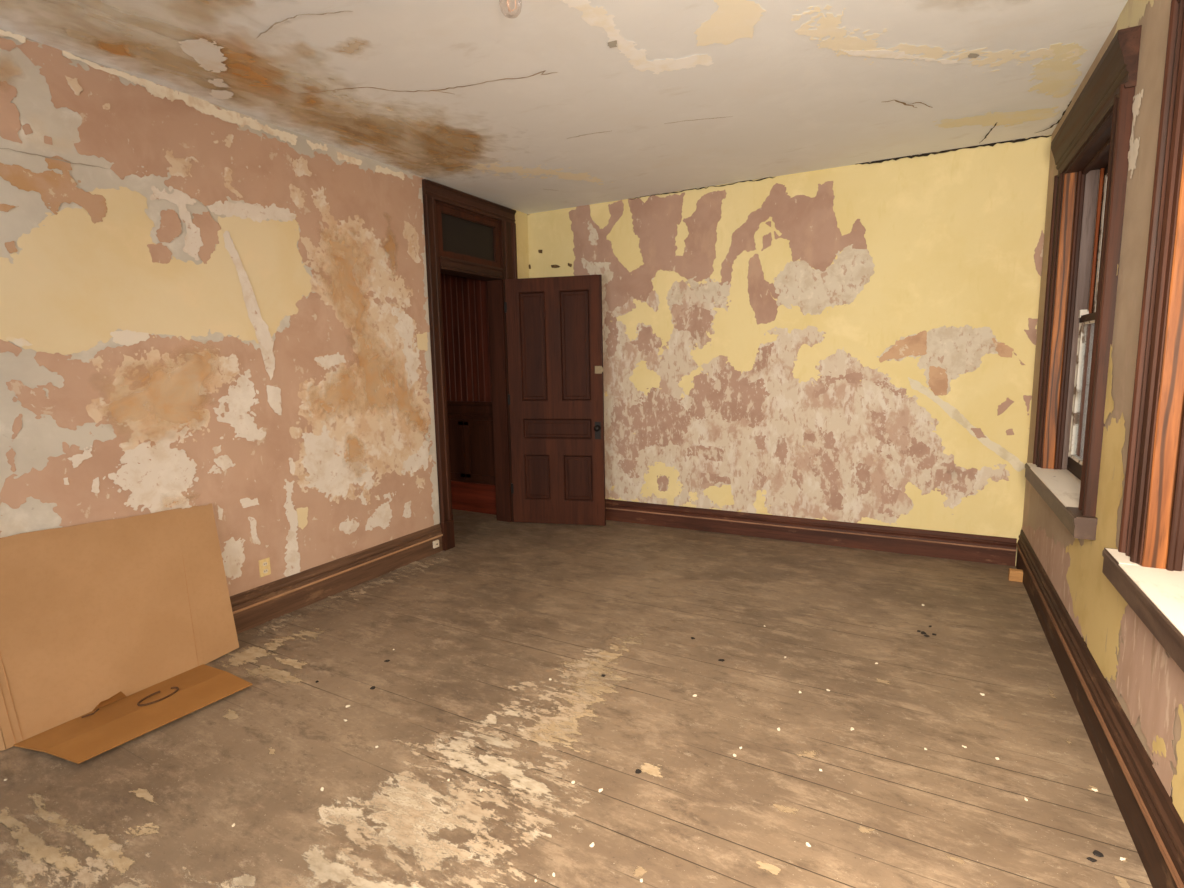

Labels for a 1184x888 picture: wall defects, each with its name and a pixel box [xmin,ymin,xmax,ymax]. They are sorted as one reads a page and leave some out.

peeling [560,0,766,74]
crack [276,70,558,94]
peeling [933,43,1087,128]
crack [0,148,106,169]
peeling [513,209,542,279]
peeling [1034,231,1044,276]
peeling [0,29,436,596]
peeling [551,181,1025,525]
peeling [1024,318,1038,345]
peeling [997,395,1032,429]